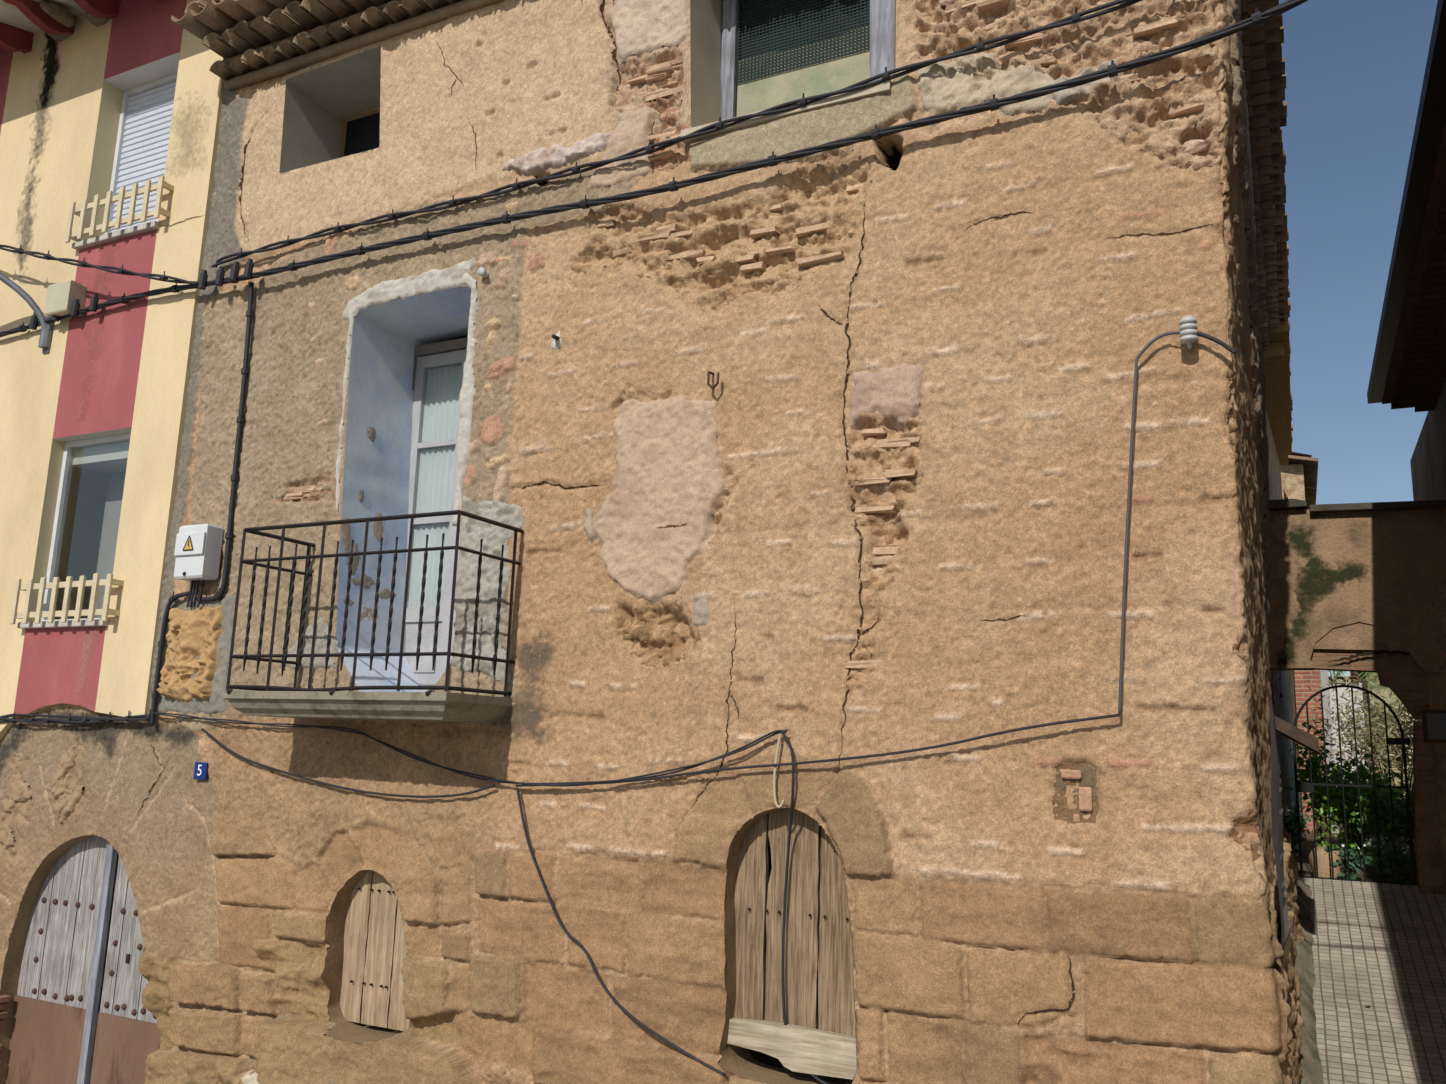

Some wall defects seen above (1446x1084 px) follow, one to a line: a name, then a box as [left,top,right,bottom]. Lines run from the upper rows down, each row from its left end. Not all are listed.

damp [19,33,59,267]
crack [238,123,259,240]
crack [581,0,621,101]
spalling [502,0,902,315]
peeling [583,388,742,669]
crack [818,191,877,781]
spalling [841,363,928,696]
crack [682,598,739,821]
crack [1018,955,1076,1026]